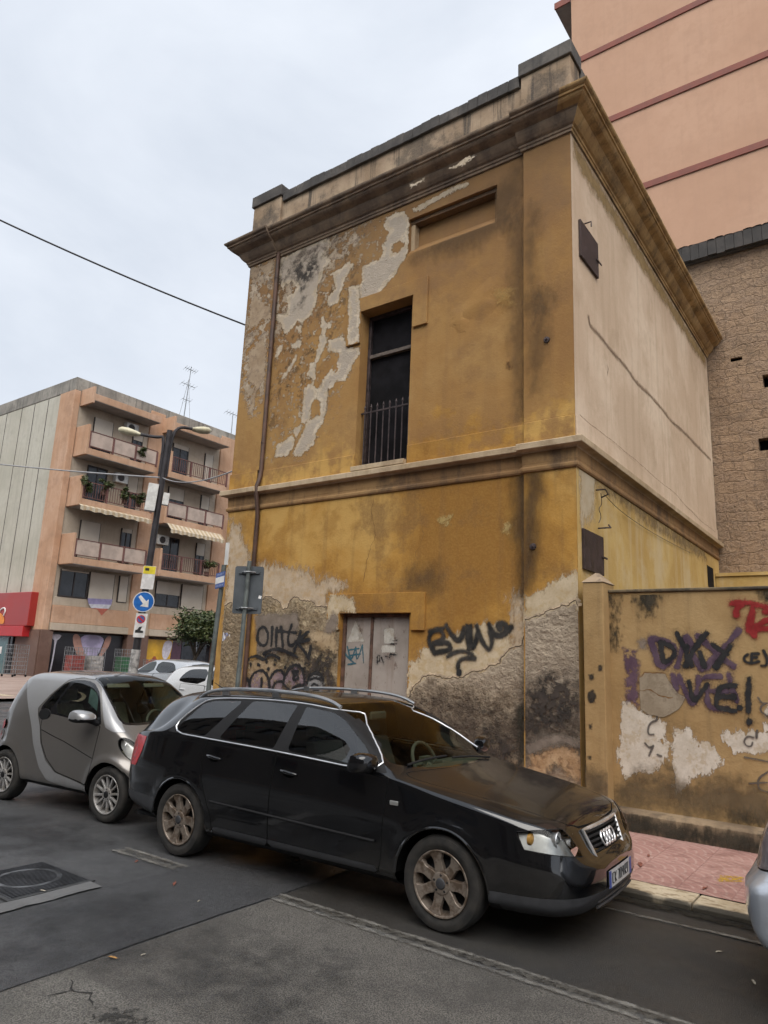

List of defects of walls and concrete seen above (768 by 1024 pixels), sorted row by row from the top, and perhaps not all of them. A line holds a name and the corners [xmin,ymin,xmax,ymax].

peeling [239,182,469,459]
spalling [248,655,283,689]
peeling [223,516,356,654]
peeling [406,570,578,695]
leakage [473,673,579,765]
leakage [513,472,541,593]
spalling [527,746,591,781]